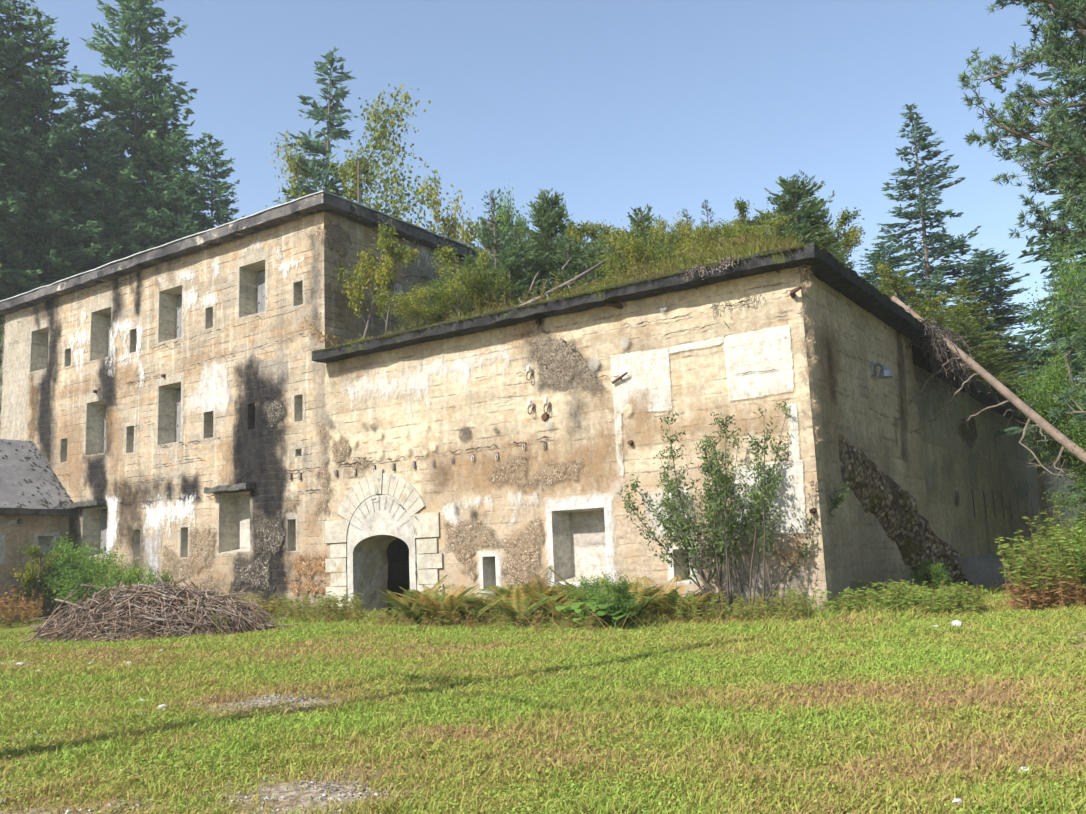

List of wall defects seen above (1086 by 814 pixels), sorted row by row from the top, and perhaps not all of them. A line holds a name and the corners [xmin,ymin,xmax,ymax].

water stain [177,272,215,308]
water stain [34,298,89,467]
spalling [528,329,605,394]
water stain [83,269,199,577]
water stain [185,359,291,606]
water stain [68,511,81,553]
spalling [444,517,543,589]